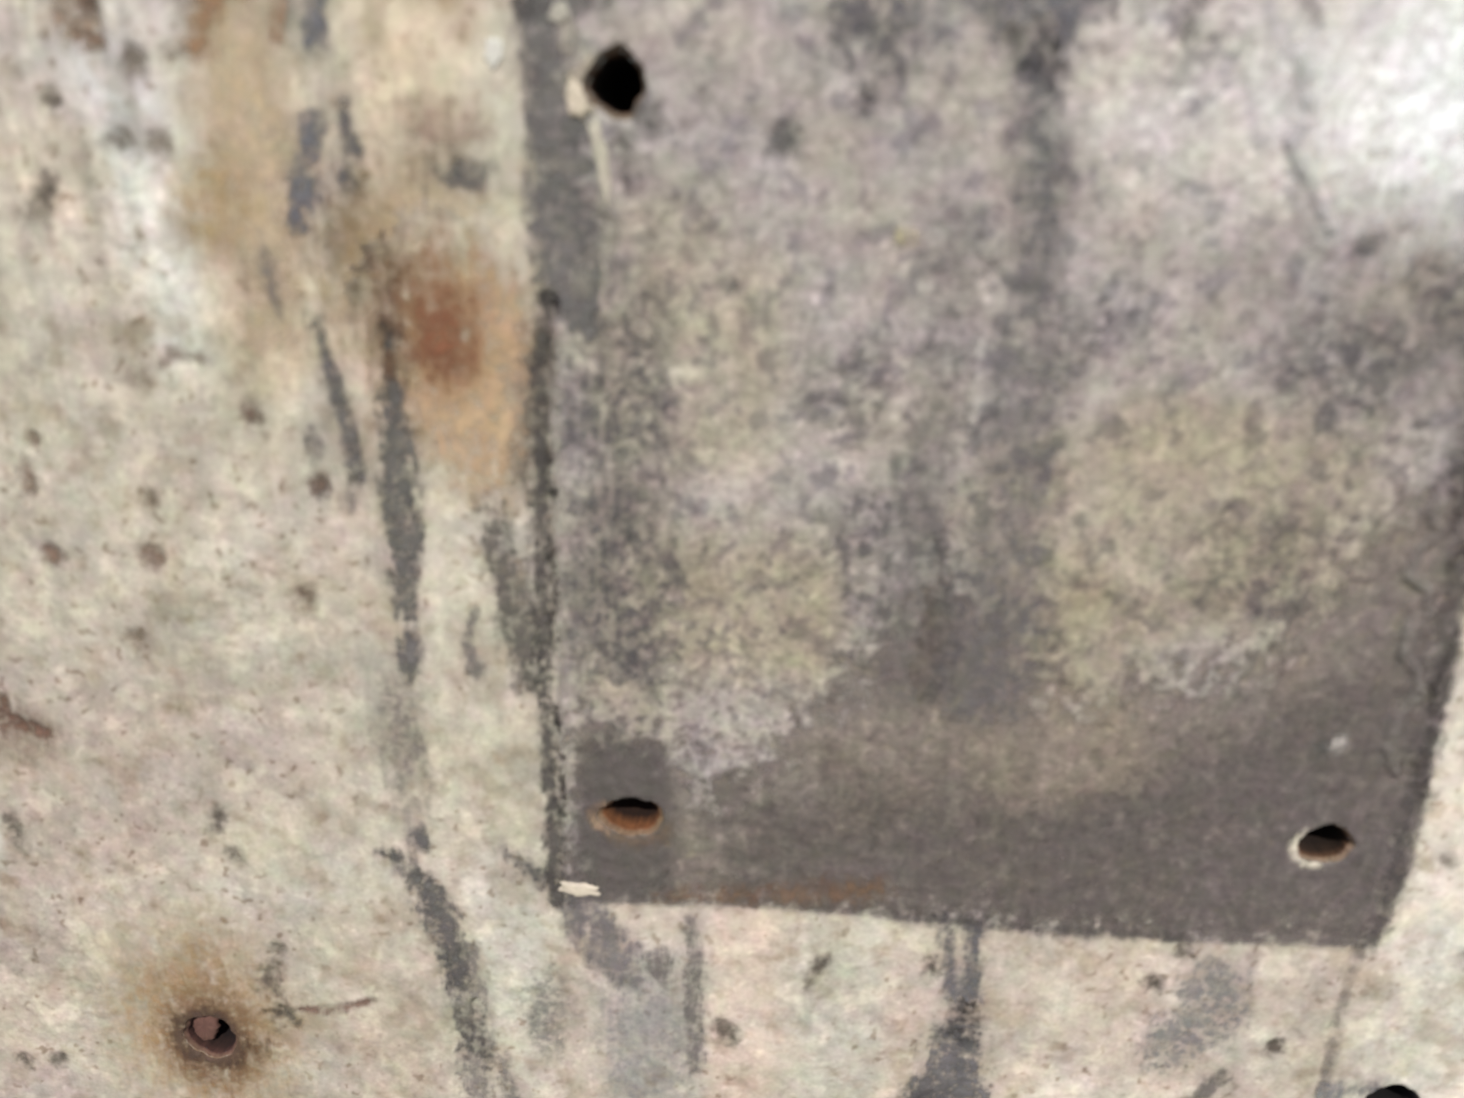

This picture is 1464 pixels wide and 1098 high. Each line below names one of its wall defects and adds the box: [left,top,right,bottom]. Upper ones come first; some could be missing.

corrosion [346,223,537,491]